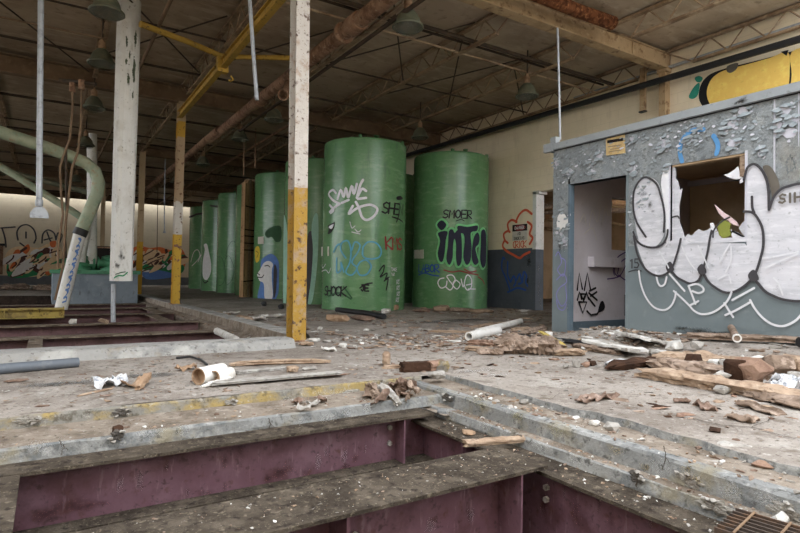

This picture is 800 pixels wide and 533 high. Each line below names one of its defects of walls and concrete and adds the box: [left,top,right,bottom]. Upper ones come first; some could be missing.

peeling [551,99,800,232]